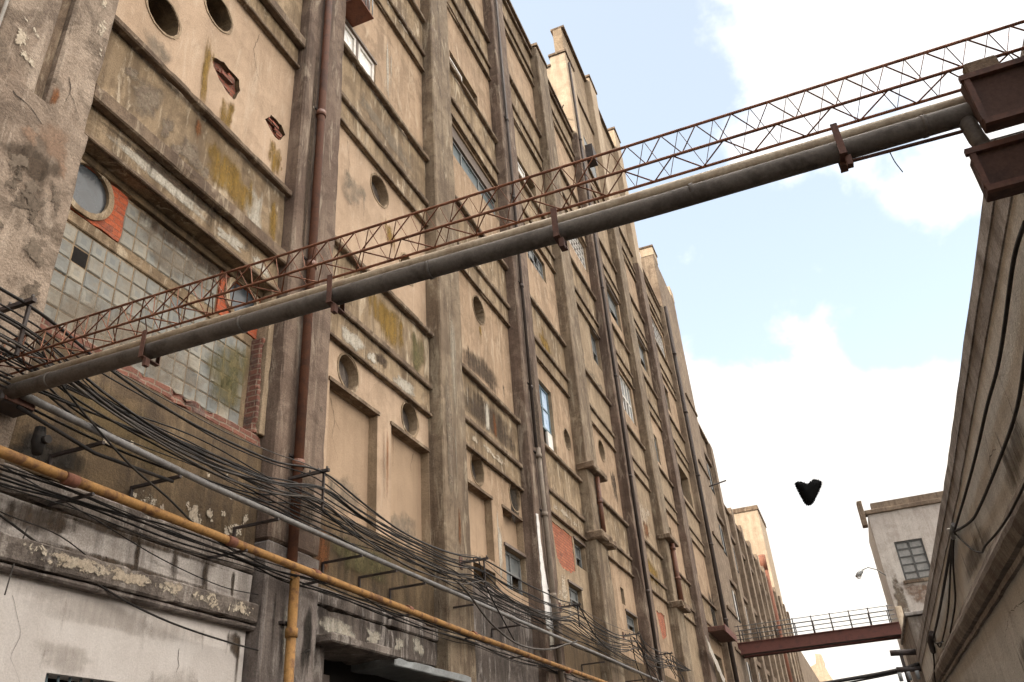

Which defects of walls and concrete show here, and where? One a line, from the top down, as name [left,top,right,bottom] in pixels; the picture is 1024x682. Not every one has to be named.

leakage [201,47,214,99]
flaking render [213,61,236,97]
flaking render [265,117,282,140]
leakage [370,296,424,372]
peeling [186,501,249,536]
peeling [24,542,254,616]
flaking render [552,504,577,619]